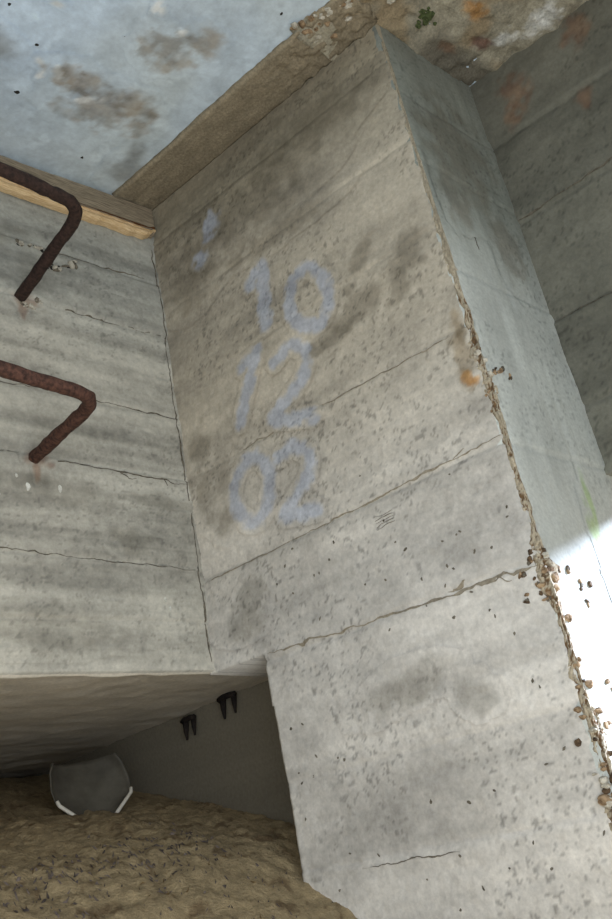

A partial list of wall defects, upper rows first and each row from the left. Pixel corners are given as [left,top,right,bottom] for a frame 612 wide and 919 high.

spalling [290,0,589,86]
leakage [0,15,235,195]
rust [8,286,47,322]
rust [18,447,58,488]
spalling [381,41,612,836]
crack [372,852,453,867]